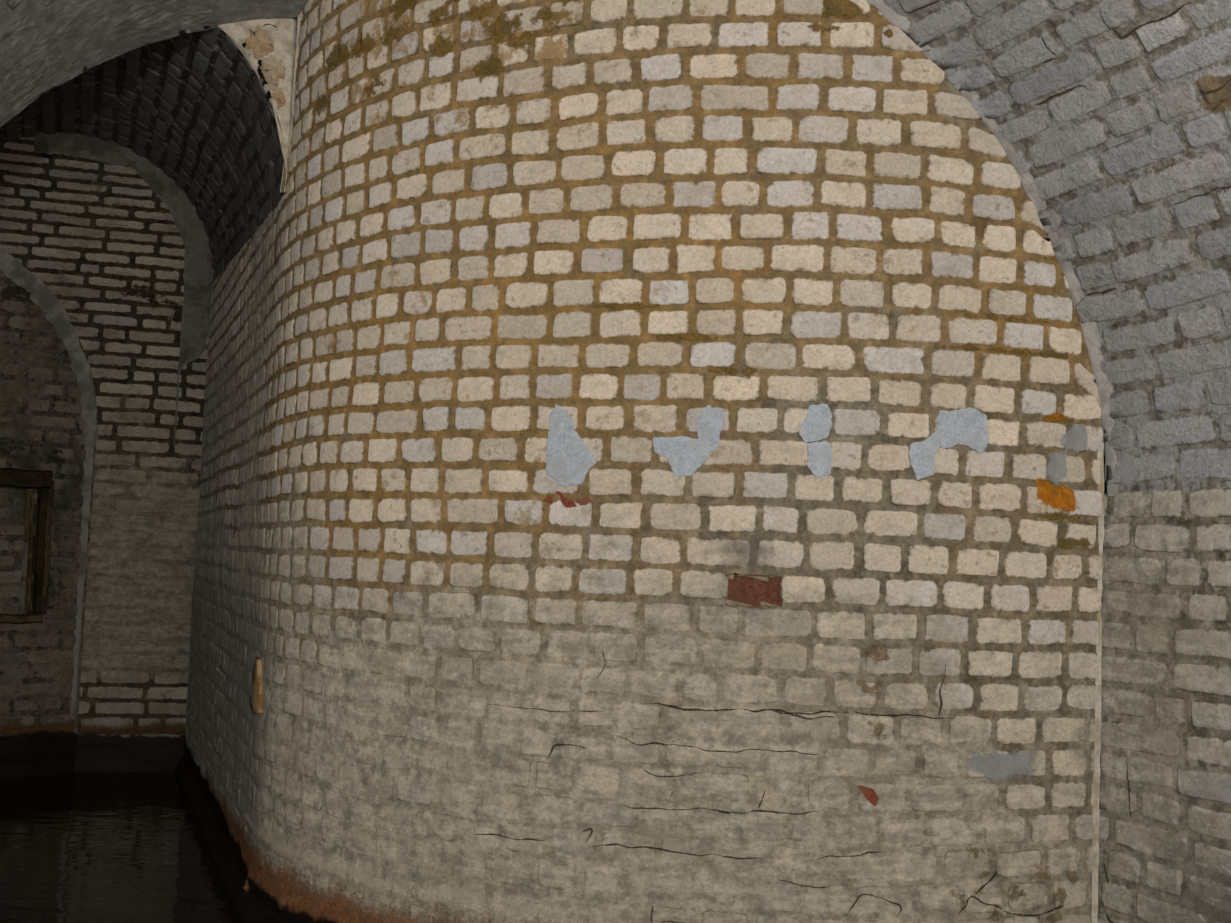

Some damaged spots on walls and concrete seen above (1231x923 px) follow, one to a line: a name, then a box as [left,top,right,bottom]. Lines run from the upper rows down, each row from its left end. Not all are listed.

water stain [326,0,579,72]
water stain [473,57,506,82]
water stain [808,0,863,32]
peeling [543,404,597,508]
peeling [653,405,724,477]
peeling [799,403,833,478]
peeling [909,407,989,480]
crack [645,664,954,720]
crack [617,735,819,777]
water stain [0,731,336,923]
crack [581,828,761,859]
crack [621,791,817,815]